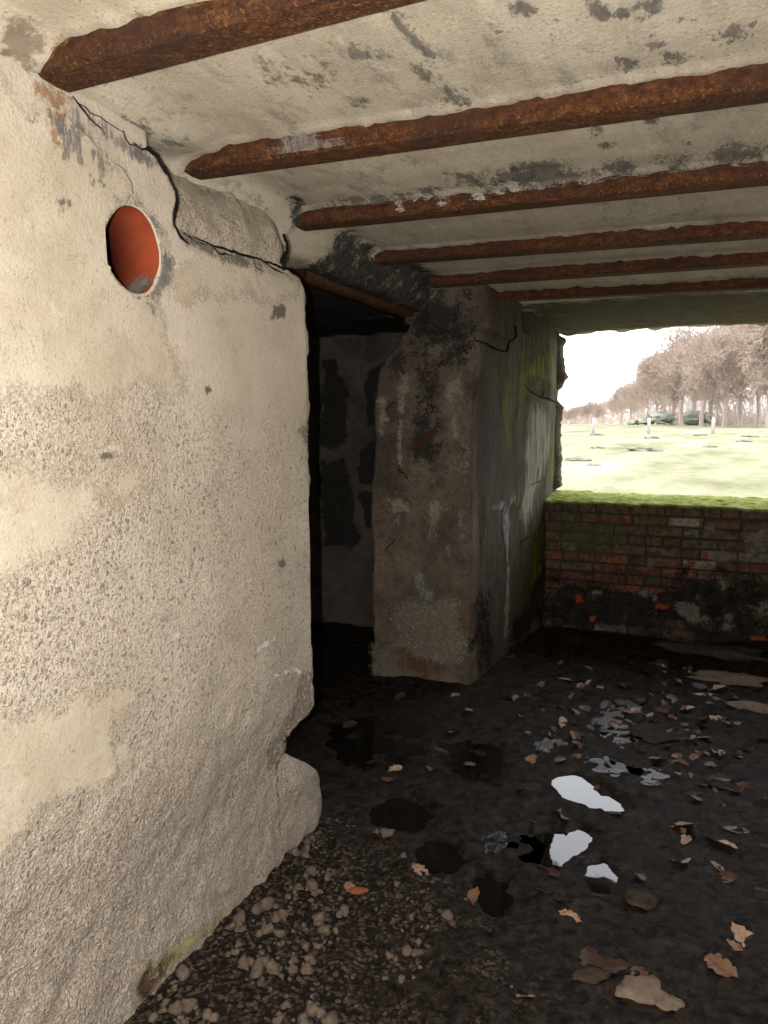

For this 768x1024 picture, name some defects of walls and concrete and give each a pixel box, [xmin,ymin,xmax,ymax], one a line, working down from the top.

crack [72,96,305,289]
leakage [300,230,441,320]
crack [525,387,557,404]
leakage [469,359,768,677]